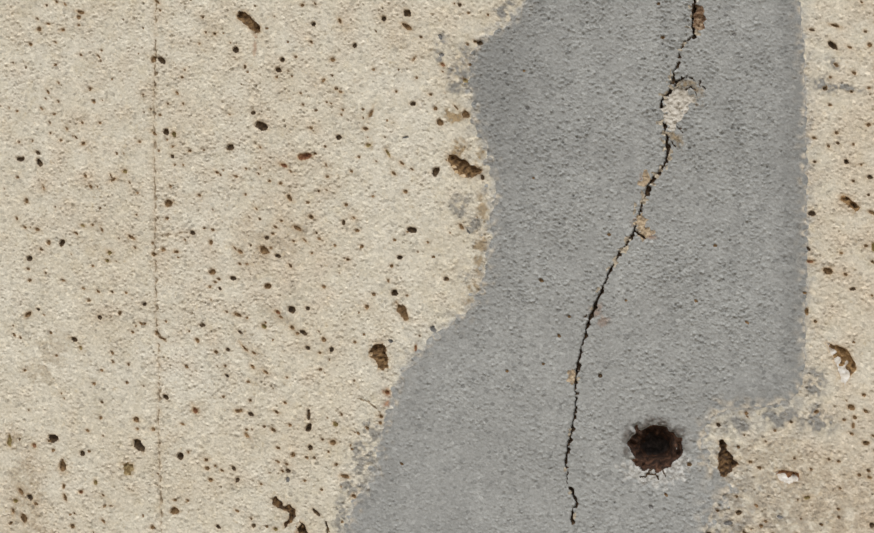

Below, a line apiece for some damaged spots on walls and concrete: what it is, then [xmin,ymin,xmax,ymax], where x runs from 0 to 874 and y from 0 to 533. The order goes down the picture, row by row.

crack [564,0,706,525]
spalling [659,81,697,131]